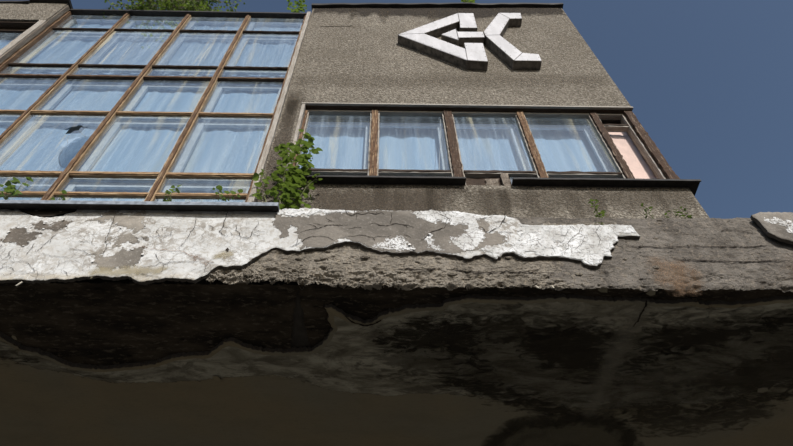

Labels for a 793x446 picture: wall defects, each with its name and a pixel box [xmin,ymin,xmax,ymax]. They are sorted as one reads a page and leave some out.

crack [0,212,264,278]
crack [291,210,451,247]
crack [400,266,554,274]
crack [628,230,792,262]
peeling [0,208,793,409]
damp [373,309,793,446]